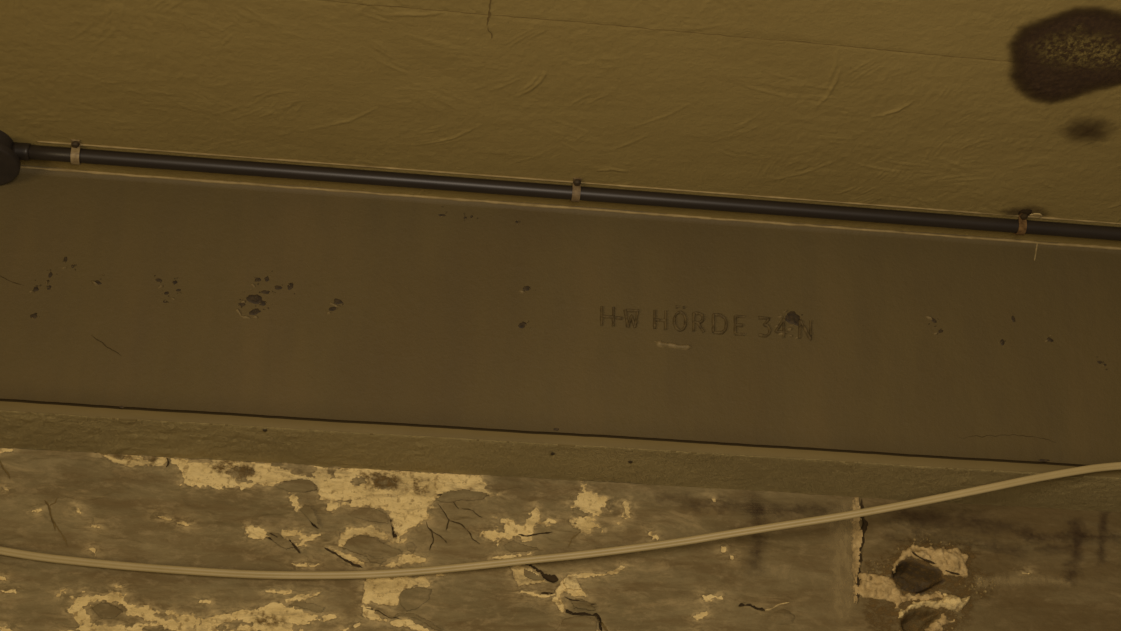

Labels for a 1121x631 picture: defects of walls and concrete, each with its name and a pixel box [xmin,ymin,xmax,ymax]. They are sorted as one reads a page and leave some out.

leakage [1012,9,1121,102]
peeling [235,271,295,320]
flaking render [56,454,498,631]
crack [426,502,481,549]
flaking render [479,481,631,631]
crack [525,564,608,631]
spalling [829,497,1070,631]